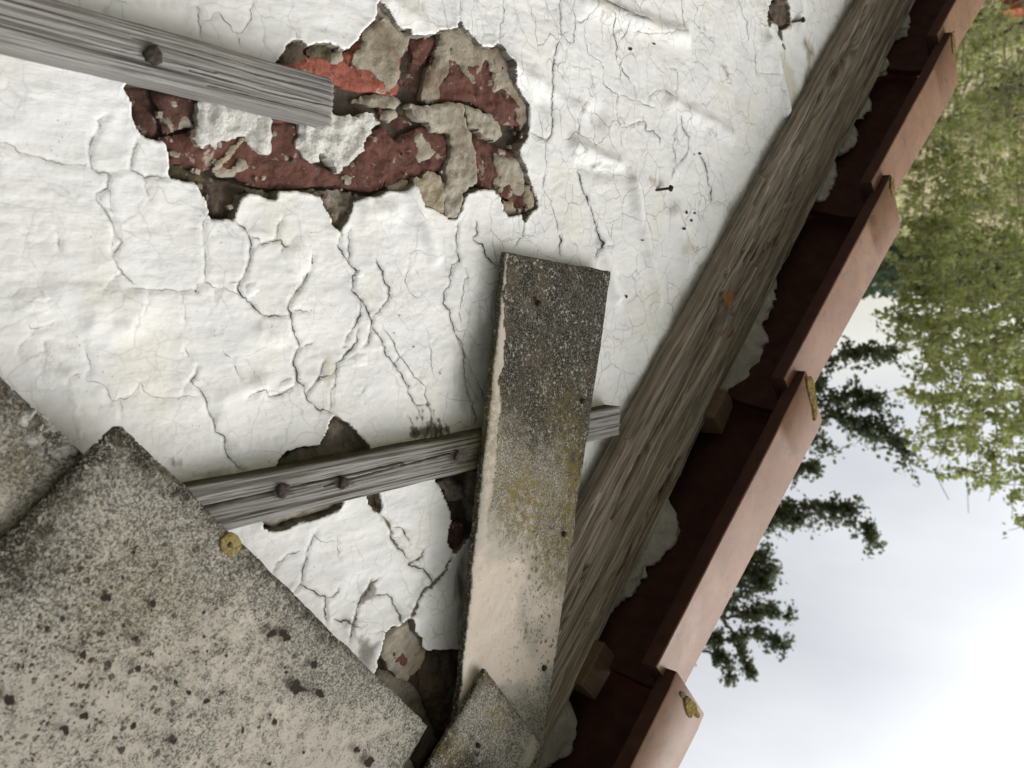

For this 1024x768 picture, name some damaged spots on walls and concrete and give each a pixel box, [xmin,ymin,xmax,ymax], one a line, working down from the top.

flaking render [767,0,788,32]
flaking render [123,6,534,227]
crack [539,0,720,256]
crack [4,118,498,429]
crack [69,352,238,467]
flaking render [277,419,360,465]
crack [277,516,453,638]
flaking render [374,620,459,768]